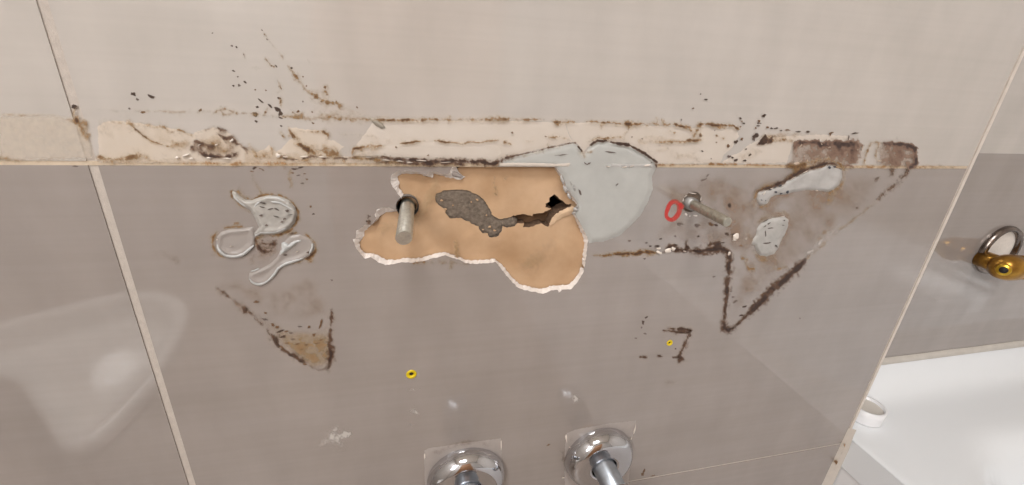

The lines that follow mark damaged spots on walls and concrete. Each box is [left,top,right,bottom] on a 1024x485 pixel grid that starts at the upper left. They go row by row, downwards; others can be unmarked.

peeling [288,127,344,158]
spalling [353,159,588,294]
damp [553,114,925,334]